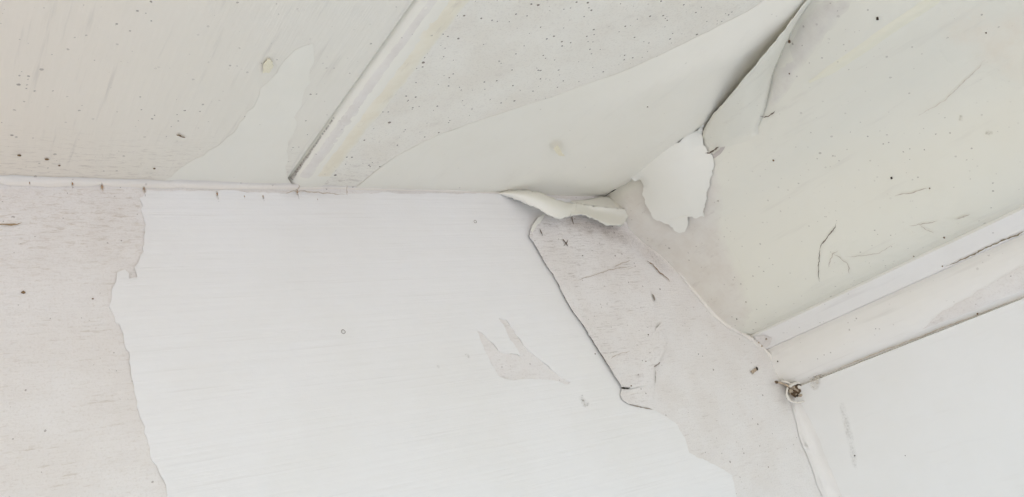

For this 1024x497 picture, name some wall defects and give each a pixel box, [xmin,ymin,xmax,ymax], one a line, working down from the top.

peeling [0,189,167,497]
peeling [477,319,570,384]
peeling [496,0,854,497]
crack [818,224,893,277]